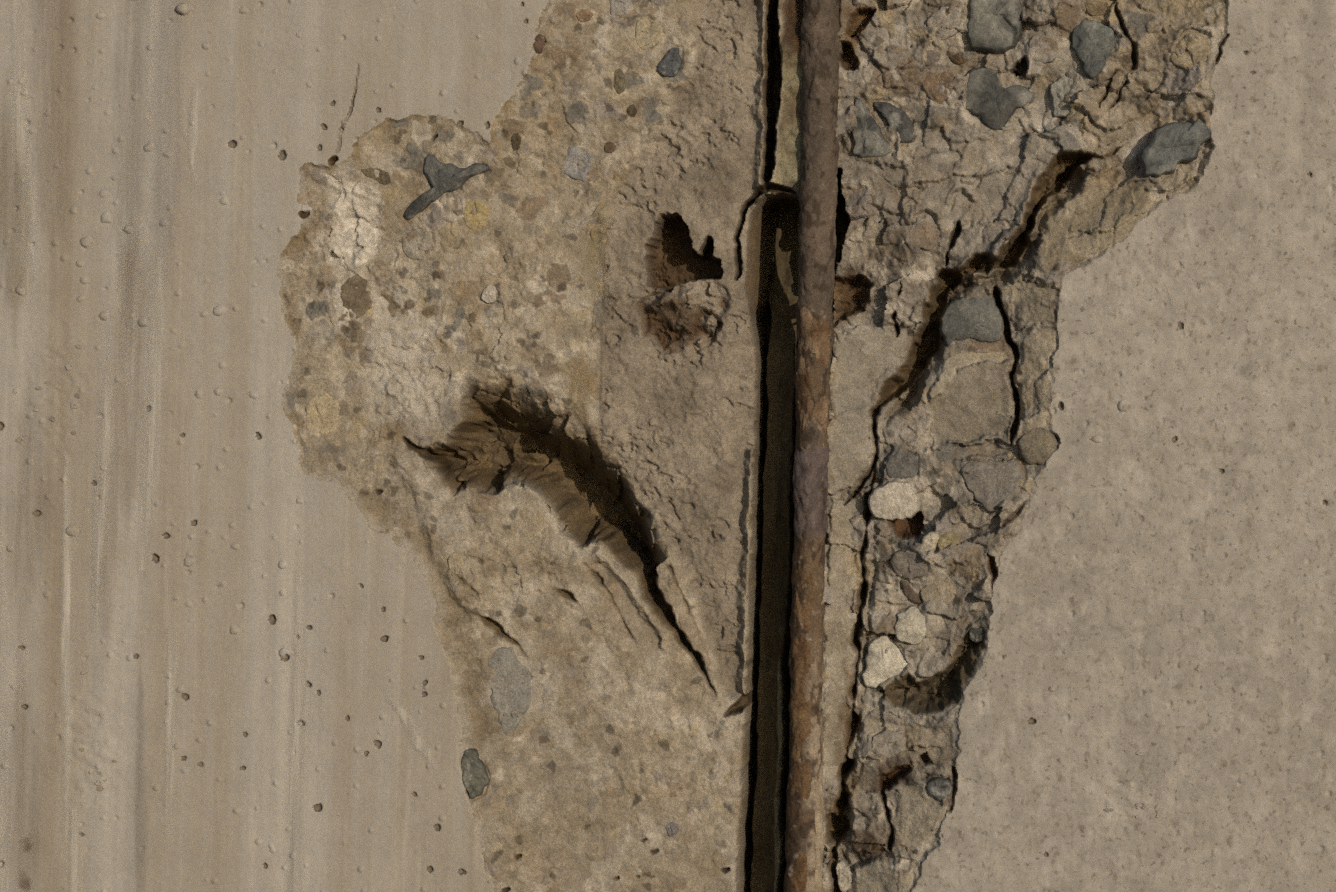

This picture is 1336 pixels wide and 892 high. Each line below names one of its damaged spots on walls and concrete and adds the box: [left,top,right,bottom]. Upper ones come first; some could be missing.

crack [733,0,797,282]
crack [1097,1,1139,112]
crack [451,573,532,662]
spalling [276,0,804,892]
crack [548,559,722,706]
corrosion [790,568,813,800]
corrosion [797,307,832,431]
crack [824,143,1125,892]
spalling [792,0,1336,892]
corrosion [791,851,807,892]